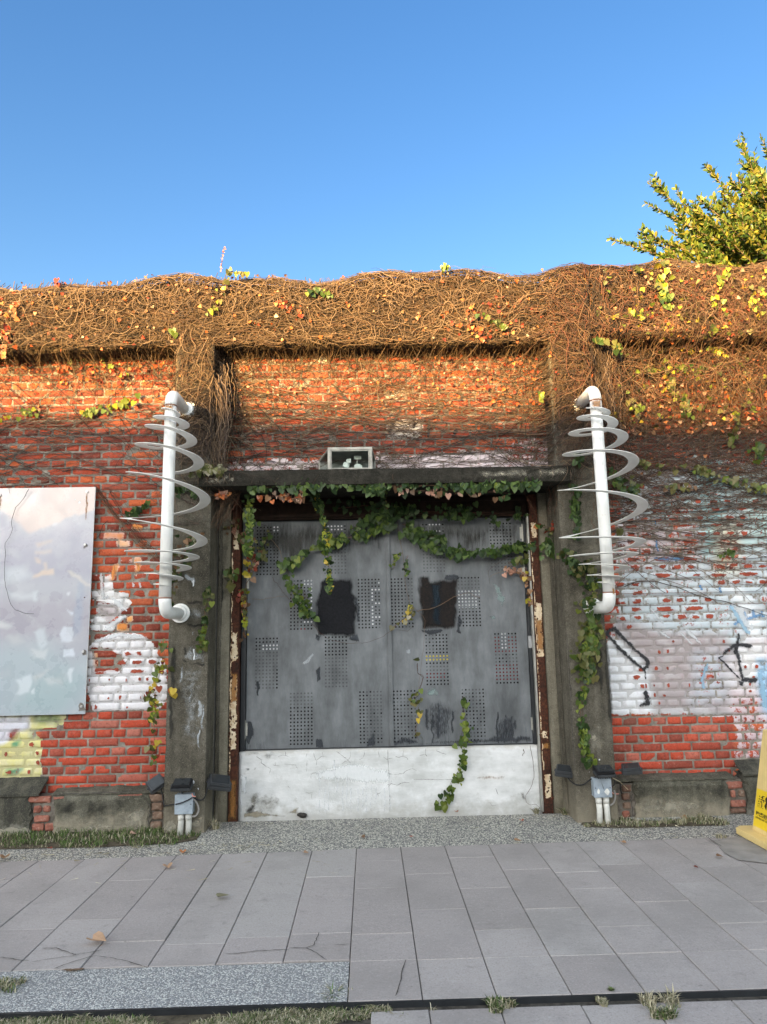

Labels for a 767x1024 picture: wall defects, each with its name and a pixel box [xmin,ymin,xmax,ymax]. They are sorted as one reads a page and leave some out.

peeling [613,485,767,584]
peeling [617,582,642,629]
peeling [657,598,714,620]
peeling [89,651,156,682]
crack [377,749,452,801]